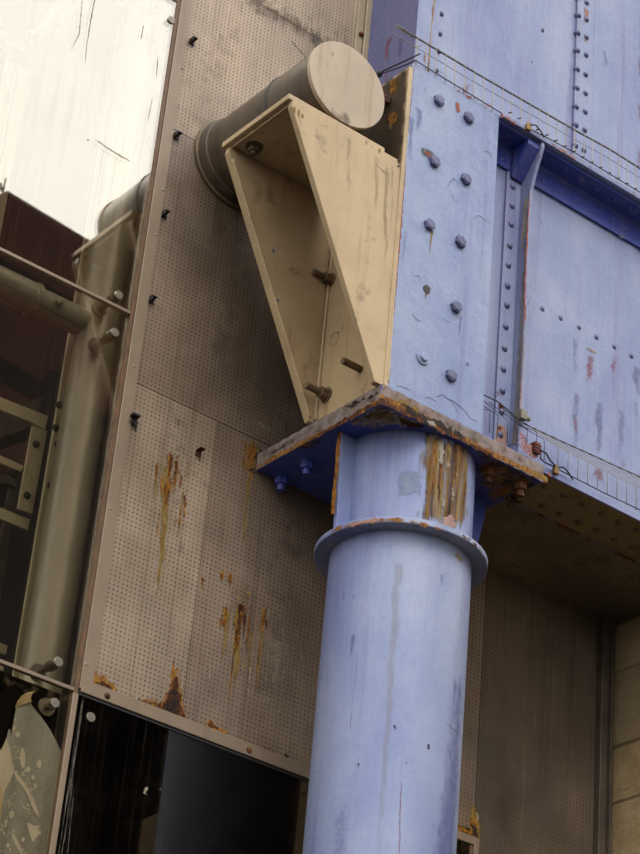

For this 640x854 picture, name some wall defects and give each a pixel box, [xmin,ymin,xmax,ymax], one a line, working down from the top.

corrosion [393,159,406,317]
corrosion [154,447,189,598]
corrosion [242,384,551,554]
corrosion [93,672,116,691]
corrosion [130,661,186,718]
corrosion [220,571,269,700]